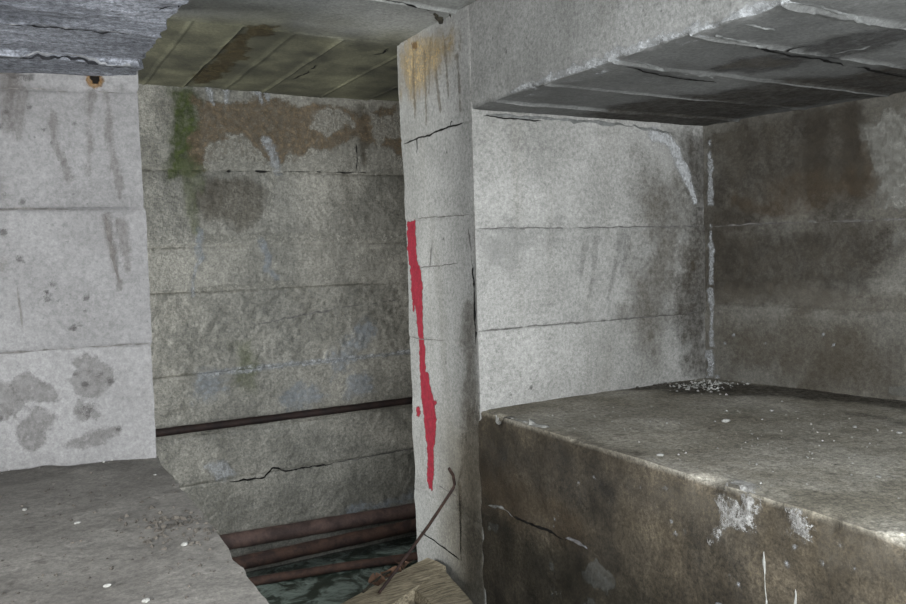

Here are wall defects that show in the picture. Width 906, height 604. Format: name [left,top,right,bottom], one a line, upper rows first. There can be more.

crack [7,24,129,35]
crack [0,51,139,69]
rust [86,76,103,88]
water stain [186,24,402,213]
crack [404,121,462,153]
water stain [594,68,906,409]
crack [230,448,413,482]
crack [488,505,587,549]
spalling [707,478,761,545]
spalling [785,508,814,547]